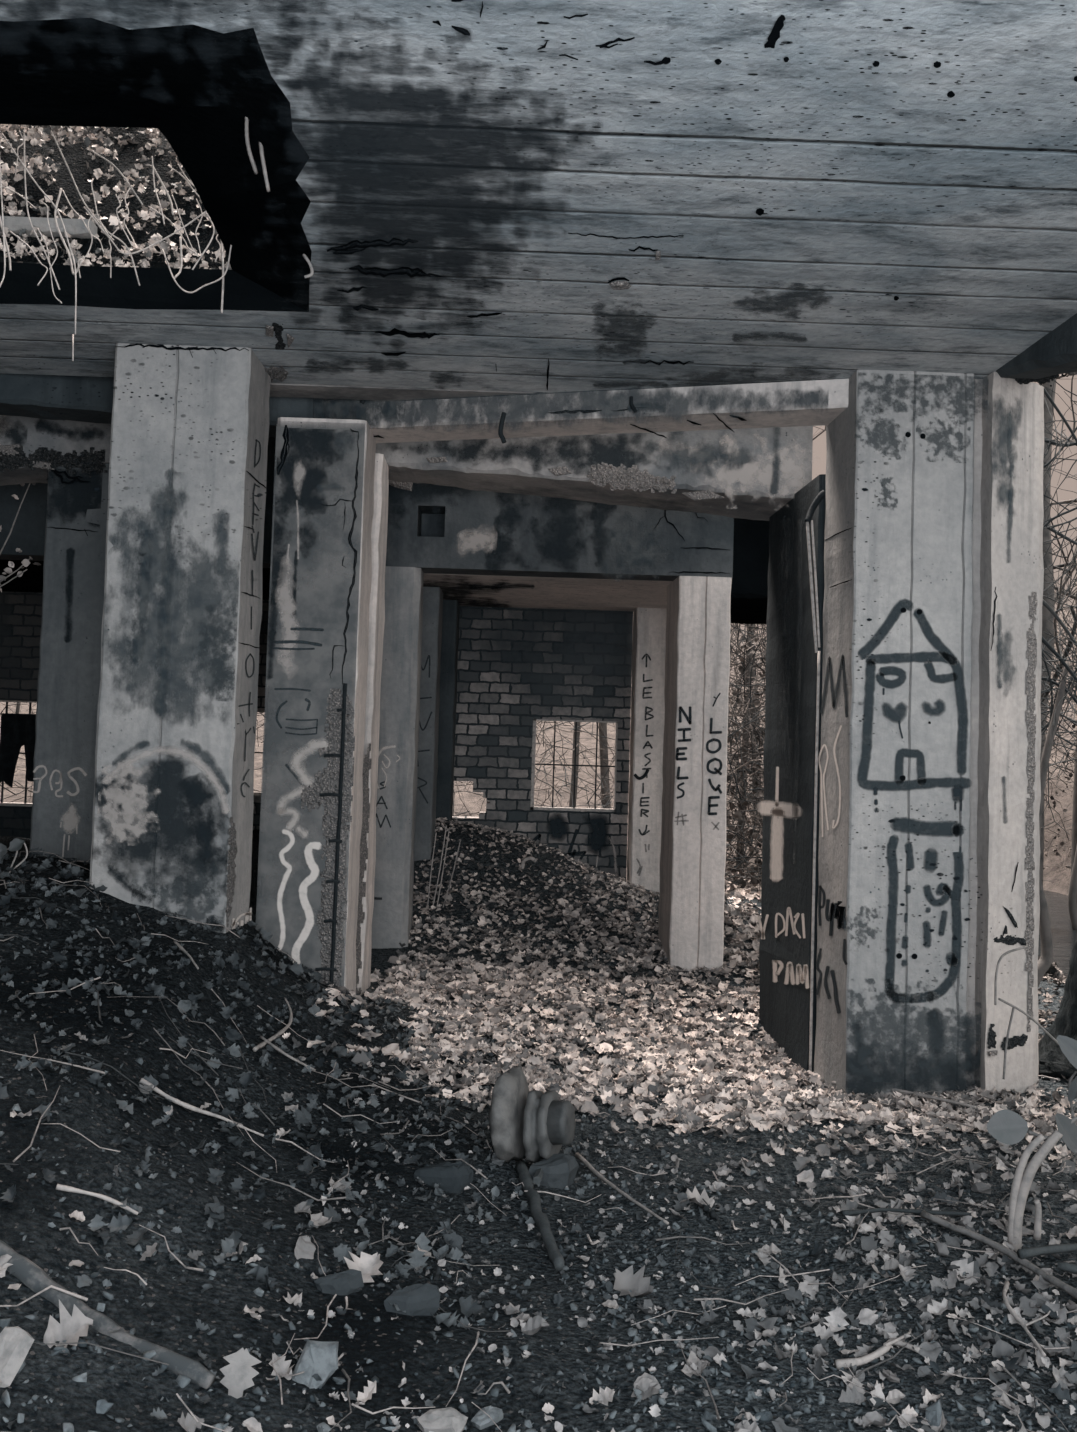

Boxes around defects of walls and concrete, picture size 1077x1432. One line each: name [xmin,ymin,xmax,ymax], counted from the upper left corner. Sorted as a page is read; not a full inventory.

leakage [0,0,225,63]
leakage [259,0,589,373]
leakage [594,302,653,364]
leakage [732,283,829,342]
leakage [858,372,989,424]
leakage [45,469,102,526]
leakage [267,367,835,679]
leakage [65,548,74,643]
leakage [102,470,239,722]
leakage [92,748,227,900]